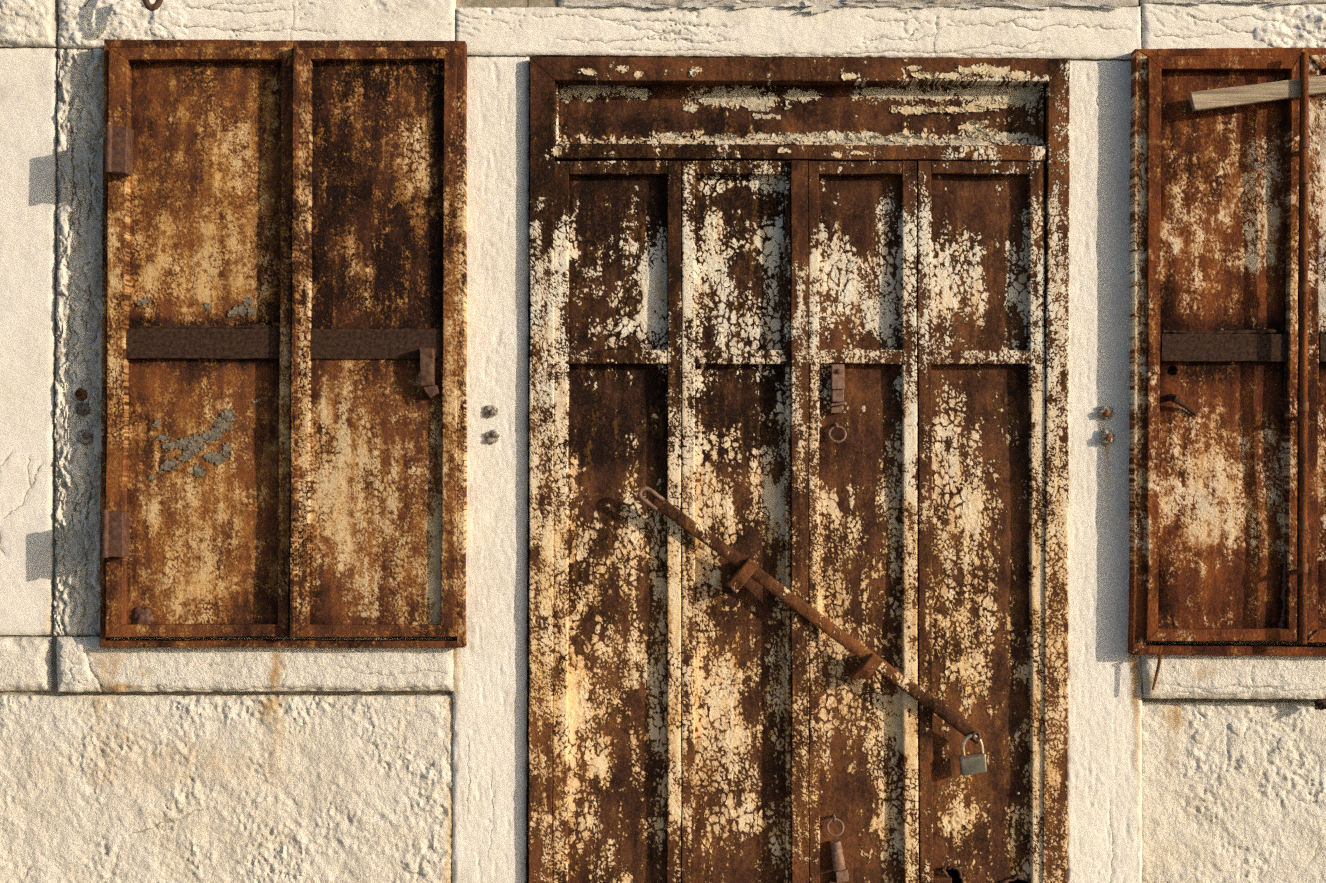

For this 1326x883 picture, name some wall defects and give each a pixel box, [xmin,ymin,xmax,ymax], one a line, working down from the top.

crack [0,453,93,621]